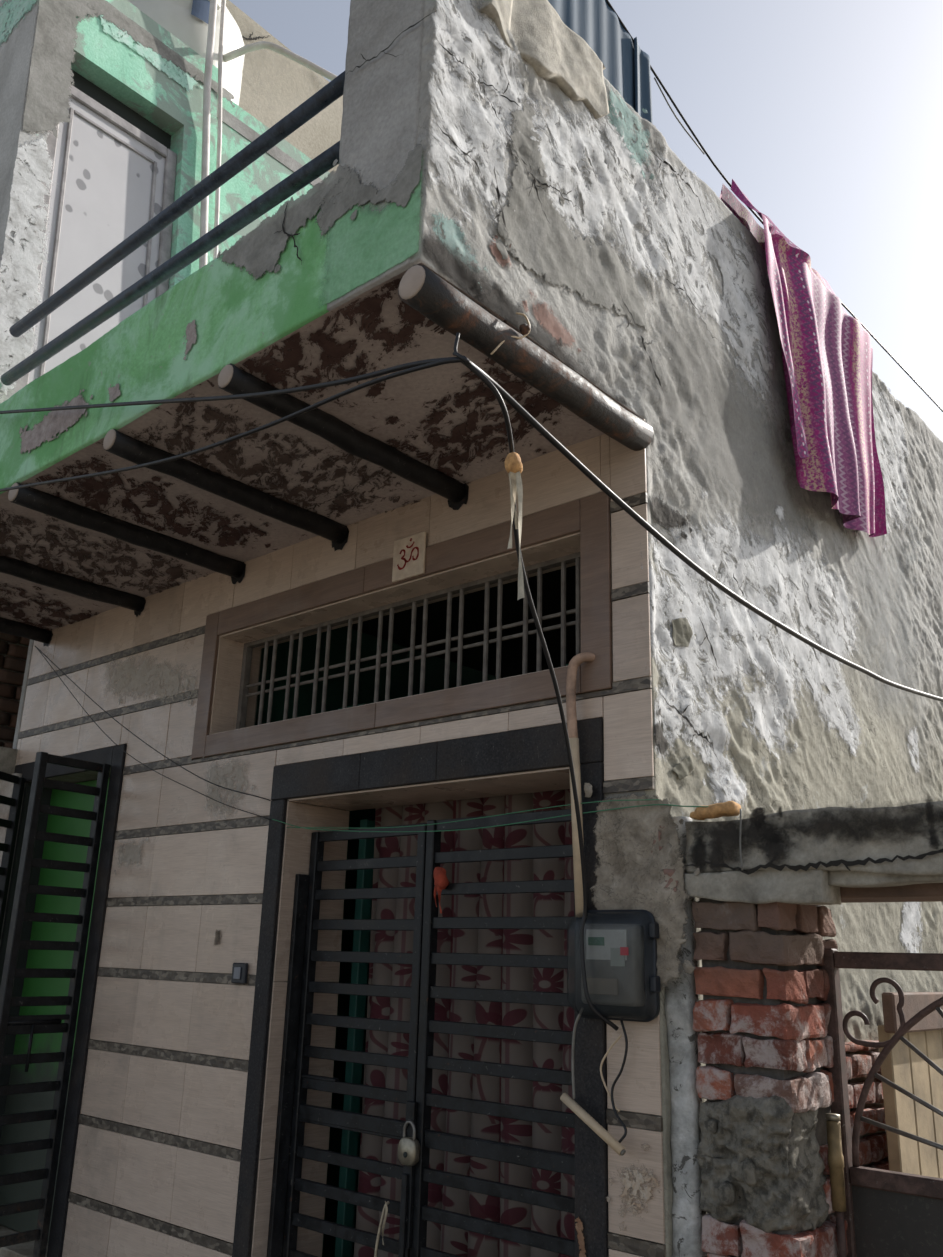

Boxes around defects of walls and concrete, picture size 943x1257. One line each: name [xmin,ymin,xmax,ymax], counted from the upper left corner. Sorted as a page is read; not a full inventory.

flaking render [23,0,235,138]
crack [274,202,302,264]
rust [423,234,631,406]
crack [620,294,667,404]
peeling [19,389,93,454]
peeling [128,396,420,524]
peeling [217,0,863,819]
peeling [907,727,920,773]
crack [685,849,943,875]
leakage [689,799,943,872]